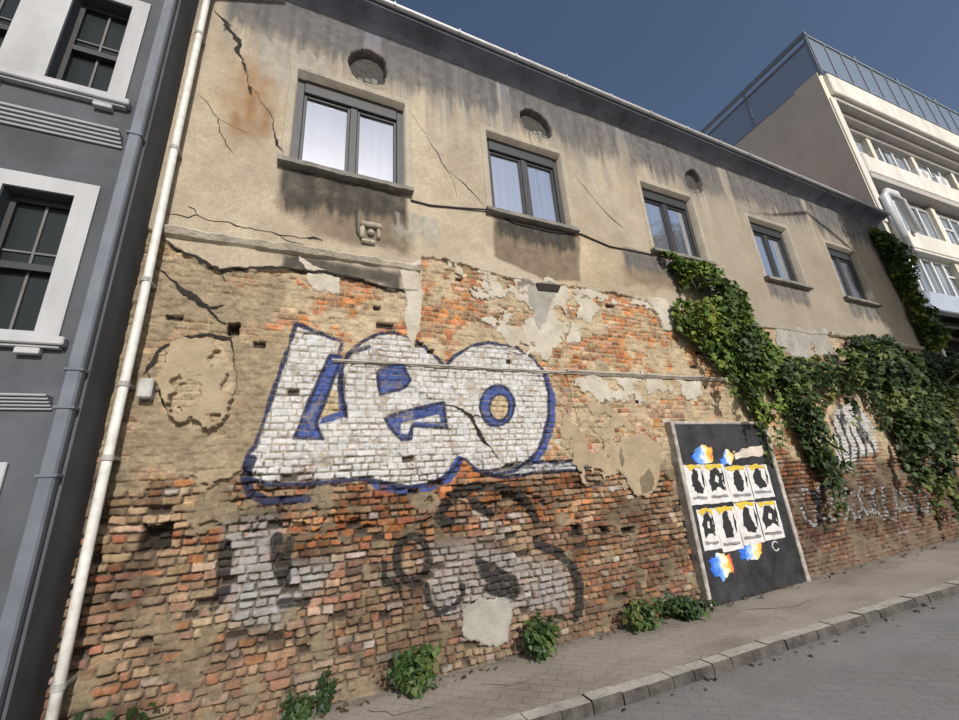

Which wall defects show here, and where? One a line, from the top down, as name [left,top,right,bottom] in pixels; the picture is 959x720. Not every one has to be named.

leakage [231,0,362,63]
crack [213,9,283,152]
crack [200,96,248,153]
crack [413,116,480,201]
crack [143,267,237,407]
crack [175,206,323,245]
crack [167,240,406,294]
peeling [298,256,341,294]
peeling [400,259,424,350]
peeling [469,268,618,362]
peeling [630,295,676,332]
peeling [559,371,702,491]